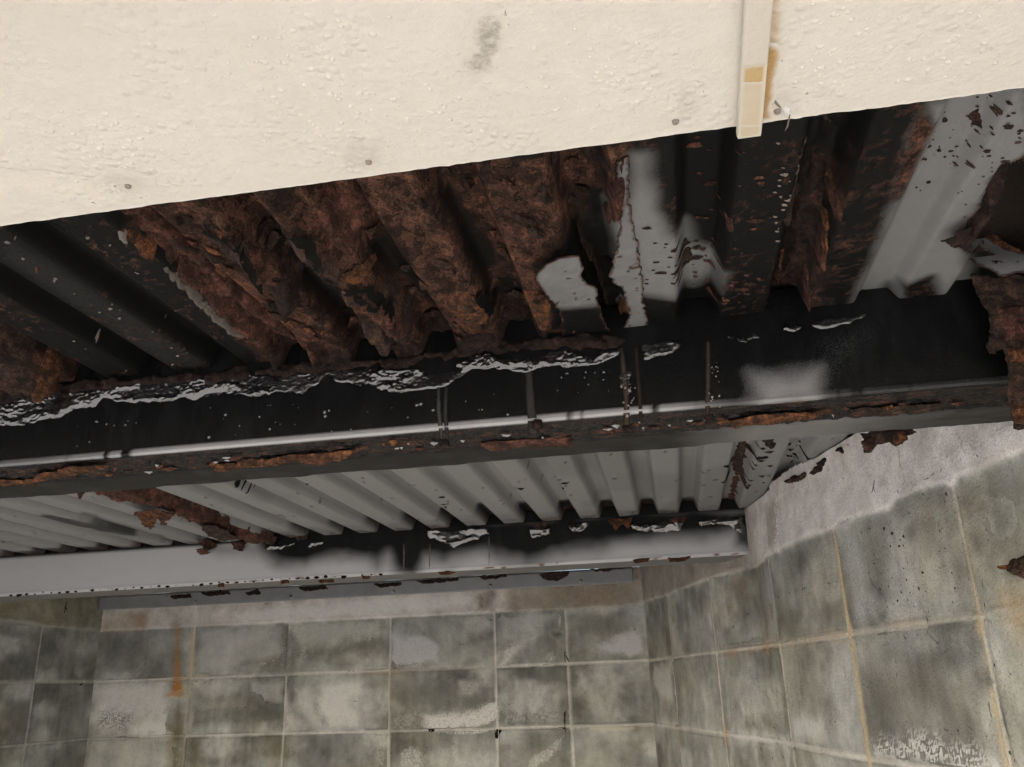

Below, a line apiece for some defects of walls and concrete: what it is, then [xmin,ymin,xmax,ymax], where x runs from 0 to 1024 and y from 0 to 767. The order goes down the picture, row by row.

damp [452,3,511,85]
peeling [603,156,625,224]
peeling [802,175,843,312]
corrosion [0,346,476,404]
corrosion [970,274,1024,431]
damp [436,387,449,440]
corrosion [720,412,819,429]
corrosion [205,449,360,472]
corrosion [769,447,846,521]
corrosion [860,429,917,498]
corrosion [958,503,1024,767]
corrosion [163,616,209,767]